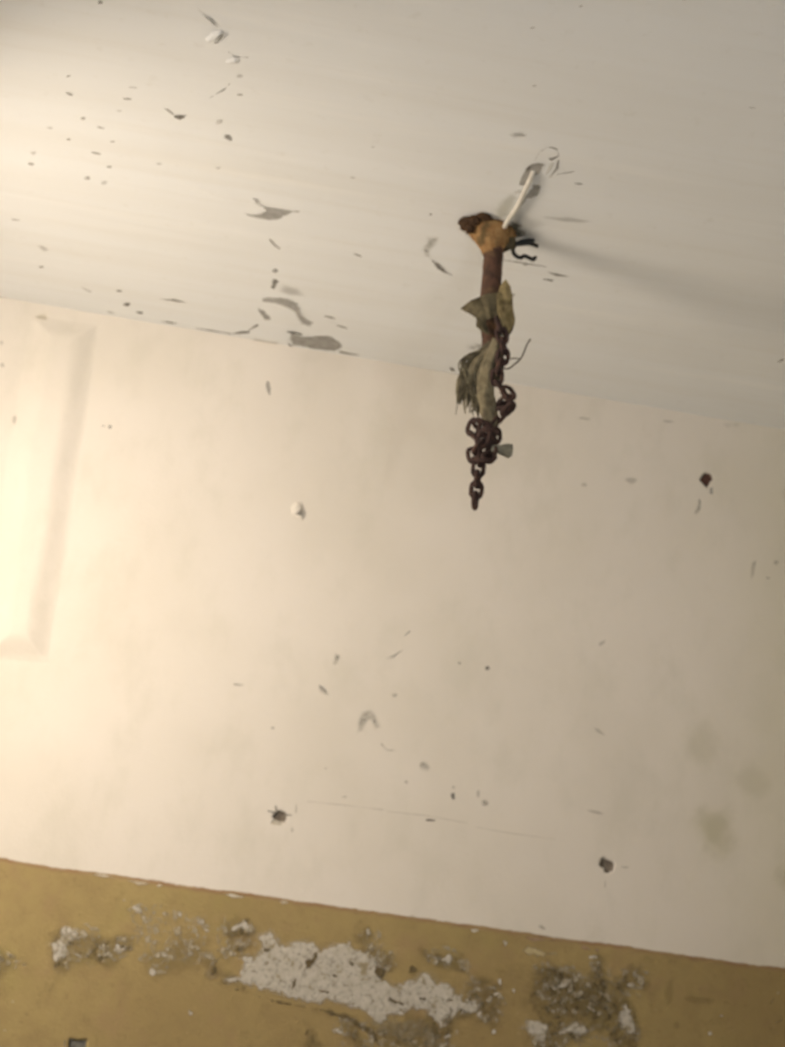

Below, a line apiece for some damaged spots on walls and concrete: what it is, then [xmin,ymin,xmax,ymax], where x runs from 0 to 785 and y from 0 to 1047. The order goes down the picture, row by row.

flaking render [51,900,515,1047]
flaking render [522,937,648,1047]